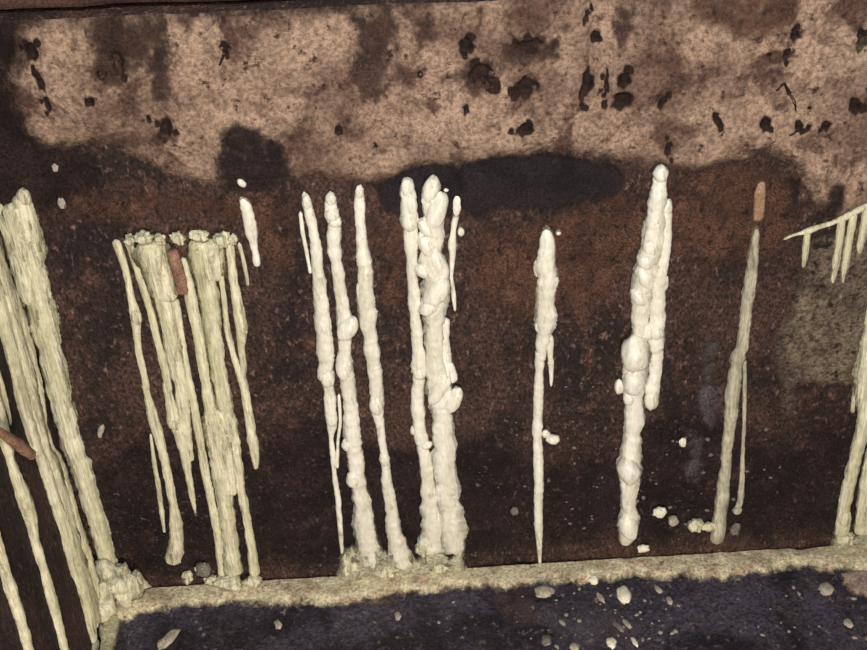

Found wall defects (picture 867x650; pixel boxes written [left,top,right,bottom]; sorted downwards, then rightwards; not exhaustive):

water stain [0,177,867,650]
corrosion [670,164,794,288]